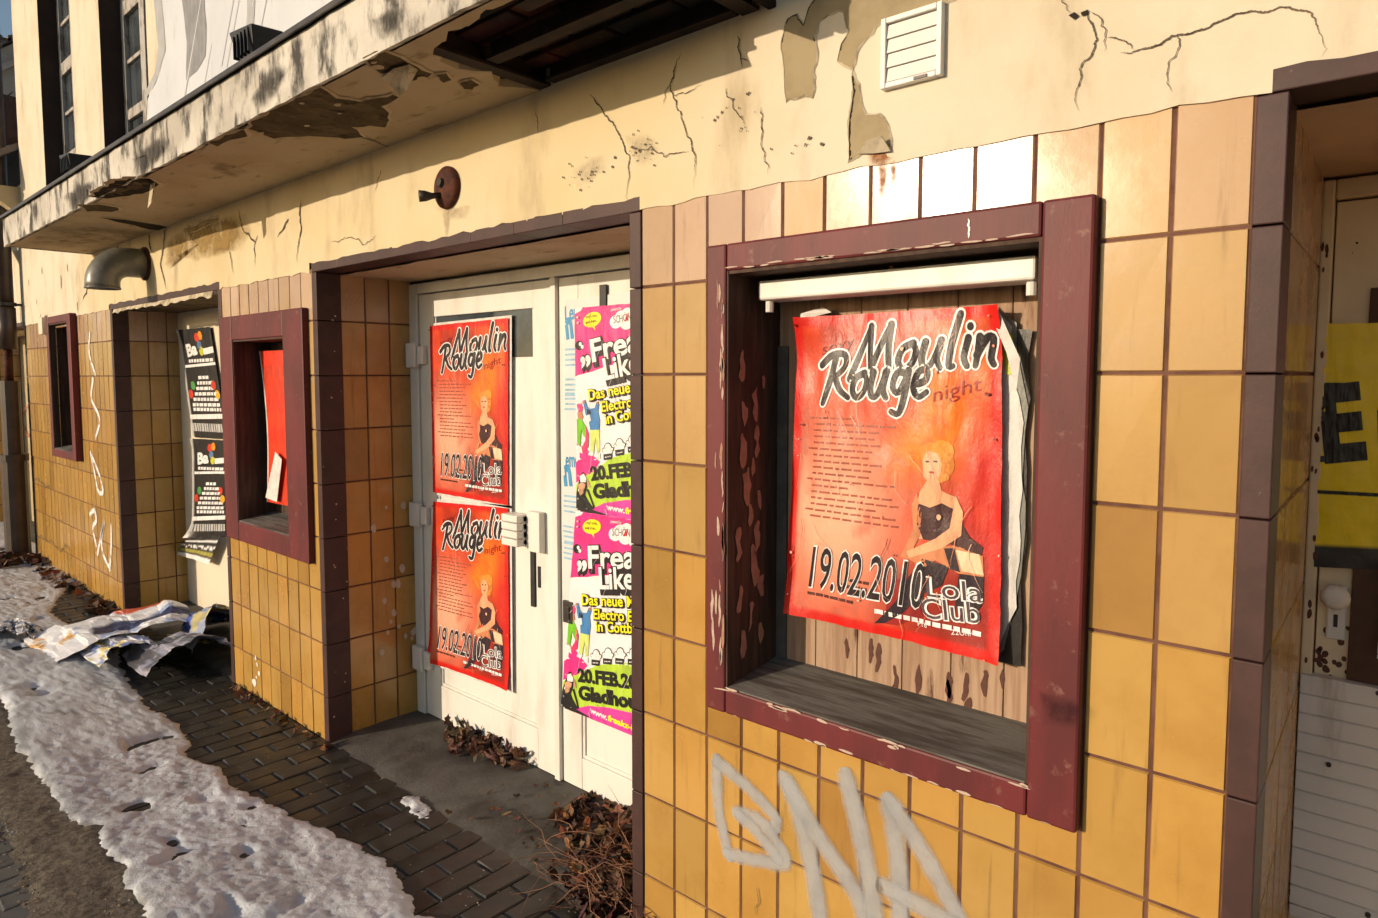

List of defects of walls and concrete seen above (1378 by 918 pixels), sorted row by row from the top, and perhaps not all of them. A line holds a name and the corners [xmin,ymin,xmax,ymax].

water stain [253,68,282,103]
spalling [204,50,483,147]
crack [591,36,769,201]
flaking render [780,0,956,163]
crack [1061,0,1327,109]
water stain [136,139,166,172]
water stain [66,183,90,210]
spalling [76,176,168,230]
water stain [169,220,240,265]
crack [229,203,375,266]
peeling [864,233,1034,254]
peeling [710,255,835,665]